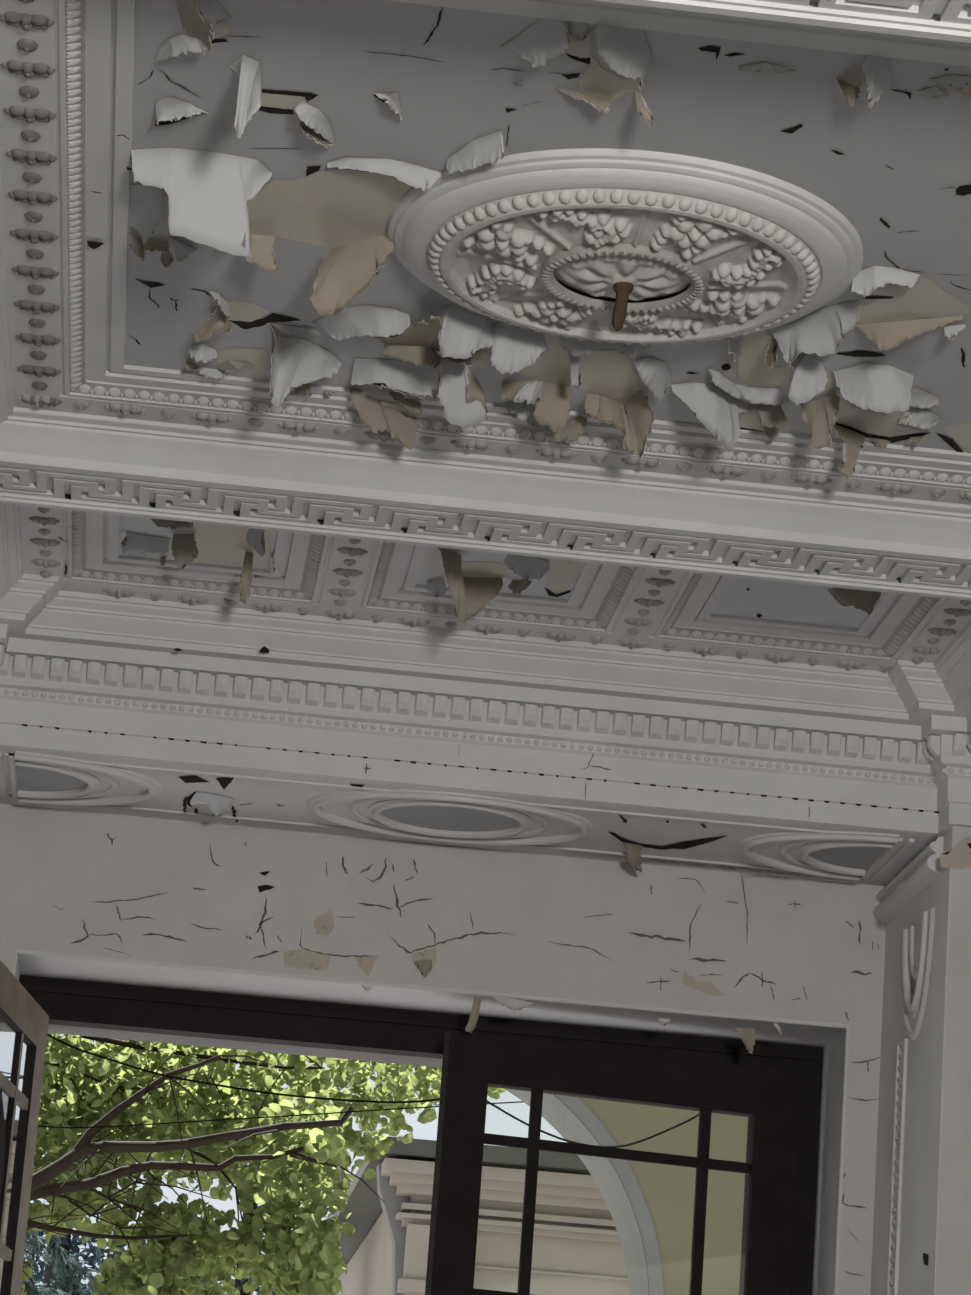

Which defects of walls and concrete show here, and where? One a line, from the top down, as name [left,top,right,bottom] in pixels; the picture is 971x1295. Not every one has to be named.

peeling [138,0,251,126]
peeling [493,18,654,126]
peeling [128,54,971,479]
peeling [120,518,275,606]
peeling [427,547,580,624]
peeling [828,588,881,615]
peeling [179,776,253,823]
peeling [609,815,726,873]
crack [53,842,282,959]
crack [326,856,514,954]
crack [548,873,748,962]
crack [845,920,879,975]